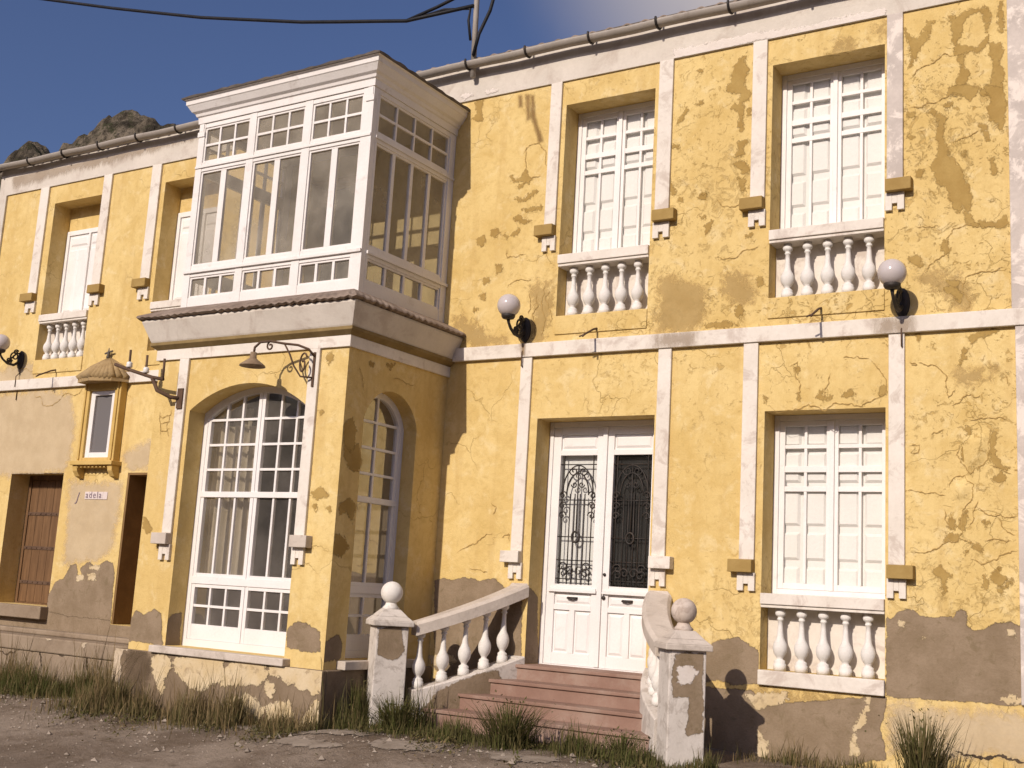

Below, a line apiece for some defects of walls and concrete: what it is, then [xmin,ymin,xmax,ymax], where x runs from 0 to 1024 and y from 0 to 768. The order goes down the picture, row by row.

peeling [726,56,752,192]
peeling [904,0,1010,229]
peeling [477,170,543,247]
crack [769,356,887,413]
peeling [343,417,363,472]
crack [909,362,1016,565]
peeling [333,534,350,558]
peeling [0,560,182,695]
peeling [286,621,342,663]
peeling [377,626,405,661]
peeling [220,661,319,727]
peeling [671,609,1021,767]